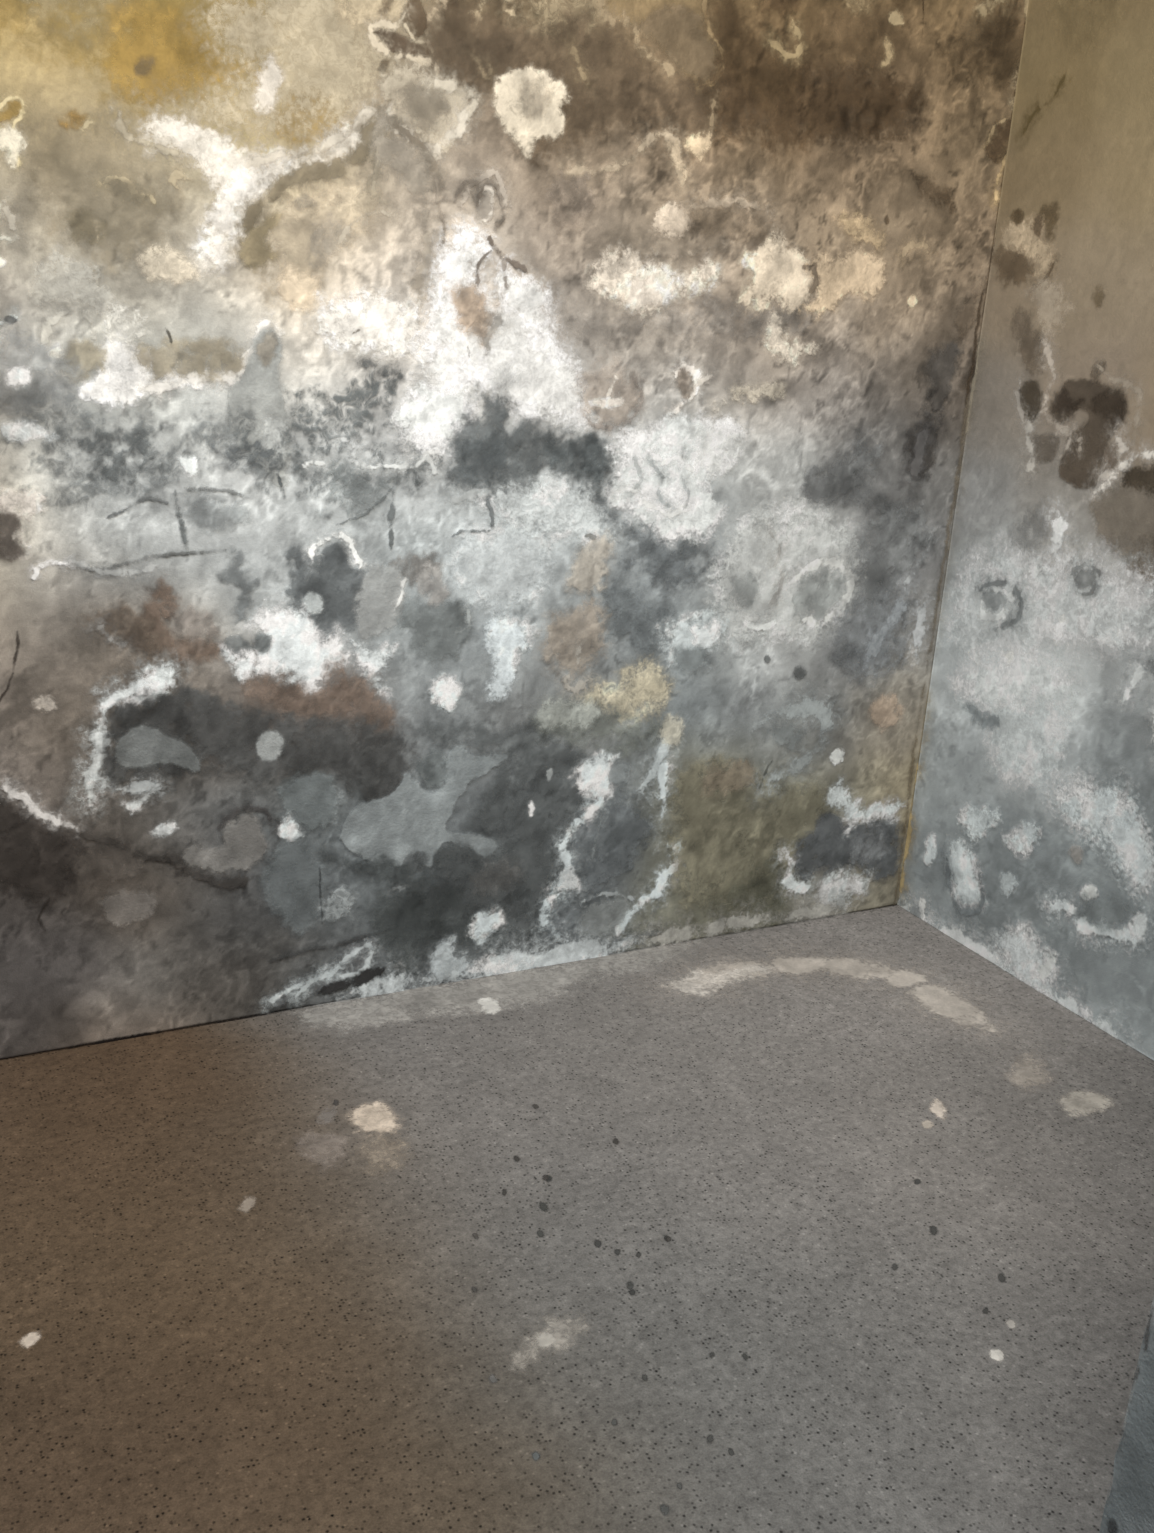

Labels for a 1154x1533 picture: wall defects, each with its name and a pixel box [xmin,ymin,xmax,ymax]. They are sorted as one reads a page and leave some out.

damp [941,15,1023,88]
damp [1012,281,1070,373]
crack [31,487,249,580]
crack [341,489,395,549]
crack [453,497,494,536]
damp [0,0,1001,1037]
crack [0,631,20,701]
damp [943,510,1154,948]
damp [897,897,1129,1044]
damp [1010,1058,1051,1088]
damp [1060,1091,1111,1117]